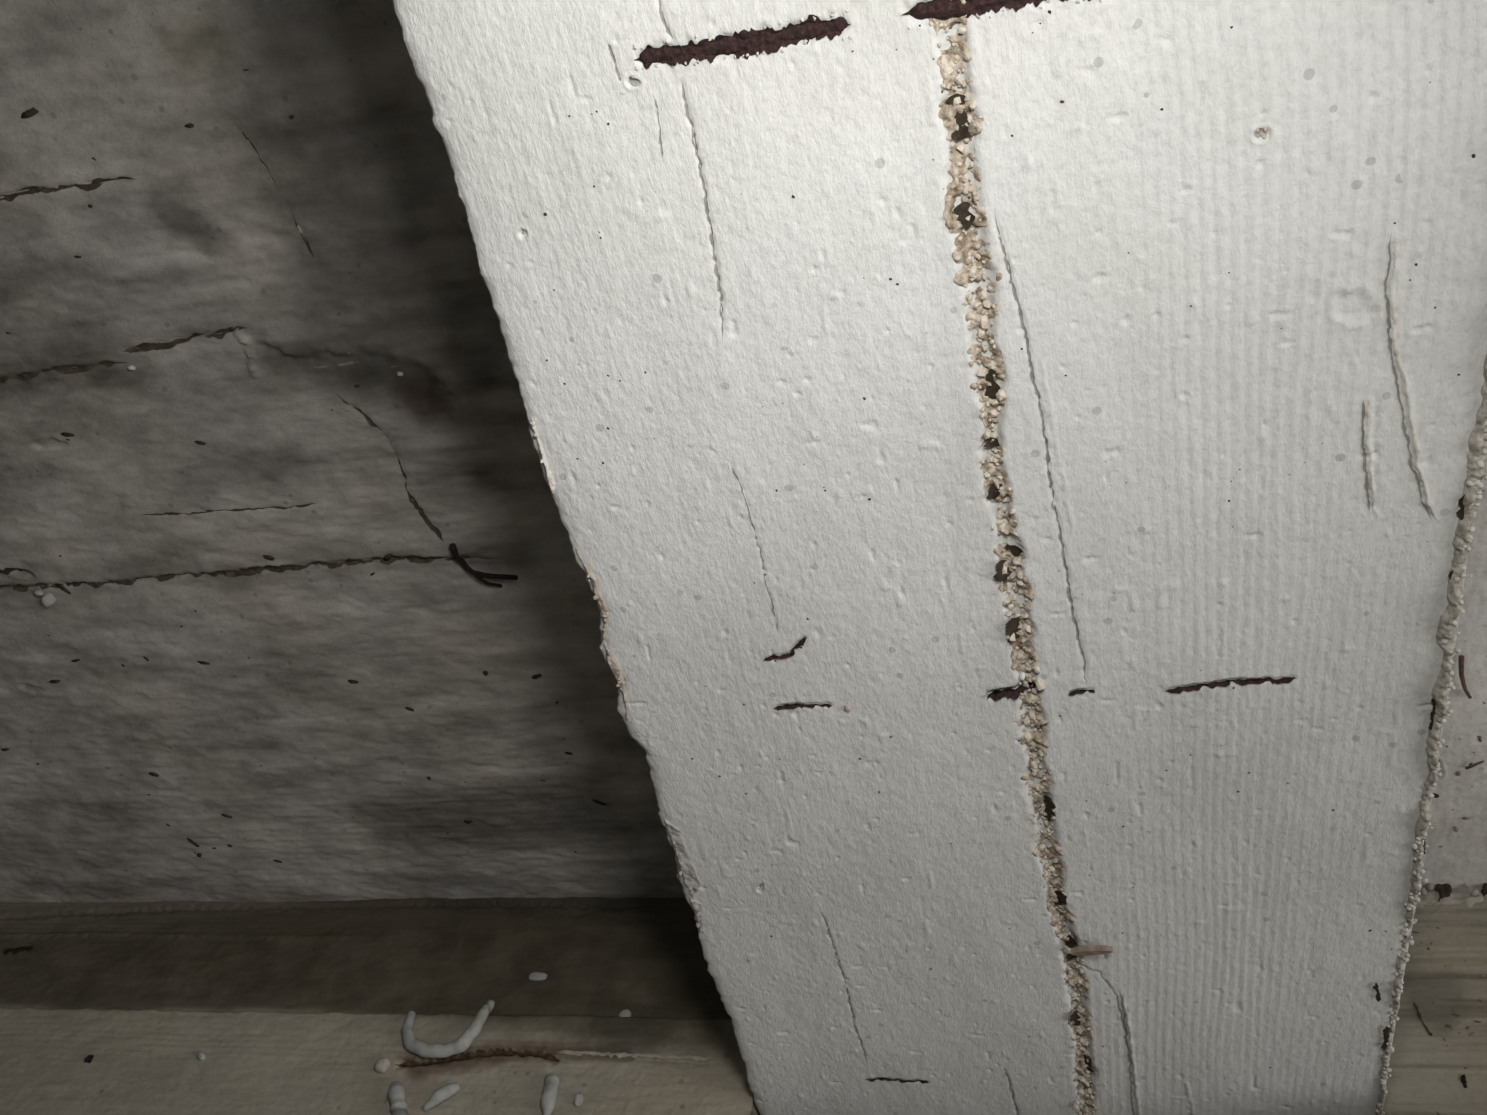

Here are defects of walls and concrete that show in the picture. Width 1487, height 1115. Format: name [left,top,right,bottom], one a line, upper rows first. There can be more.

rust [633,9,852,70]
rust [903,0,1102,29]
crack [0,326,244,383]
crack [0,396,493,607]
crack [729,460,779,635]
crack [995,214,1087,683]
crack [821,912,868,1065]
crack [1004,1066,1019,1115]
crack [1080,964,1139,1115]